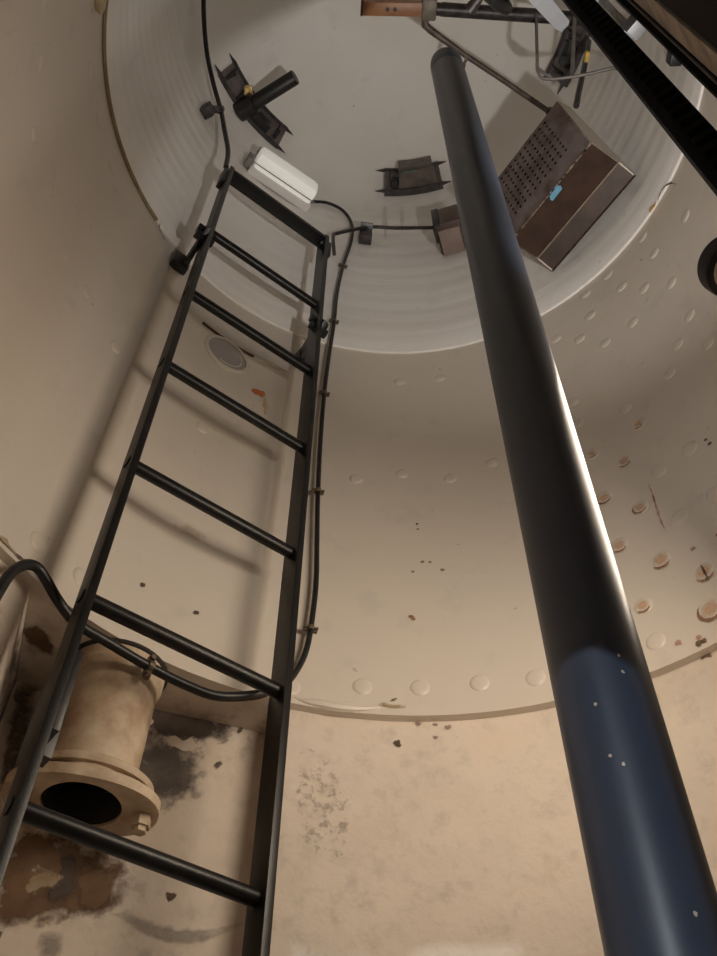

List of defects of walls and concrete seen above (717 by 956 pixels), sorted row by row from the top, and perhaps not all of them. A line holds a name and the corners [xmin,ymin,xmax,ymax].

rust [697,604,717,621]
damp [0,626,53,784]
damp [139,709,243,798]